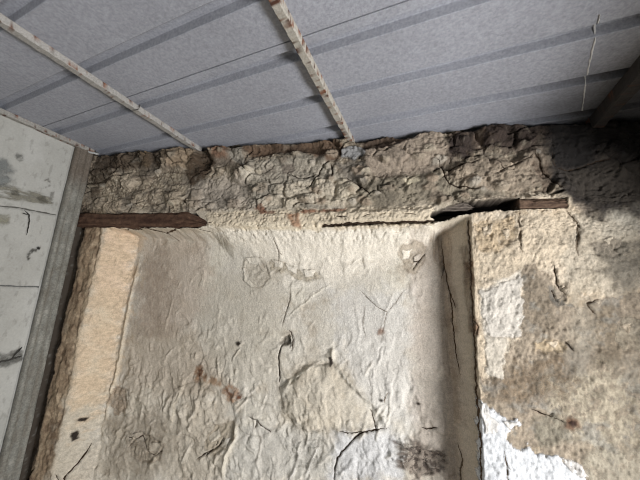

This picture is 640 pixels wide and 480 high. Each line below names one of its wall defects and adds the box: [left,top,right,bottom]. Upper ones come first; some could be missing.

crack [287,161,371,196]
crack [434,159,478,189]
crack [494,150,610,190]
crack [0,206,56,235]
crack [323,213,435,227]
damp [603,241,640,291]
crack [441,220,482,480]
peeling [474,264,640,480]
rust [223,385,241,403]
crack [334,392,389,478]
damp [394,441,445,475]
damp [584,450,640,480]